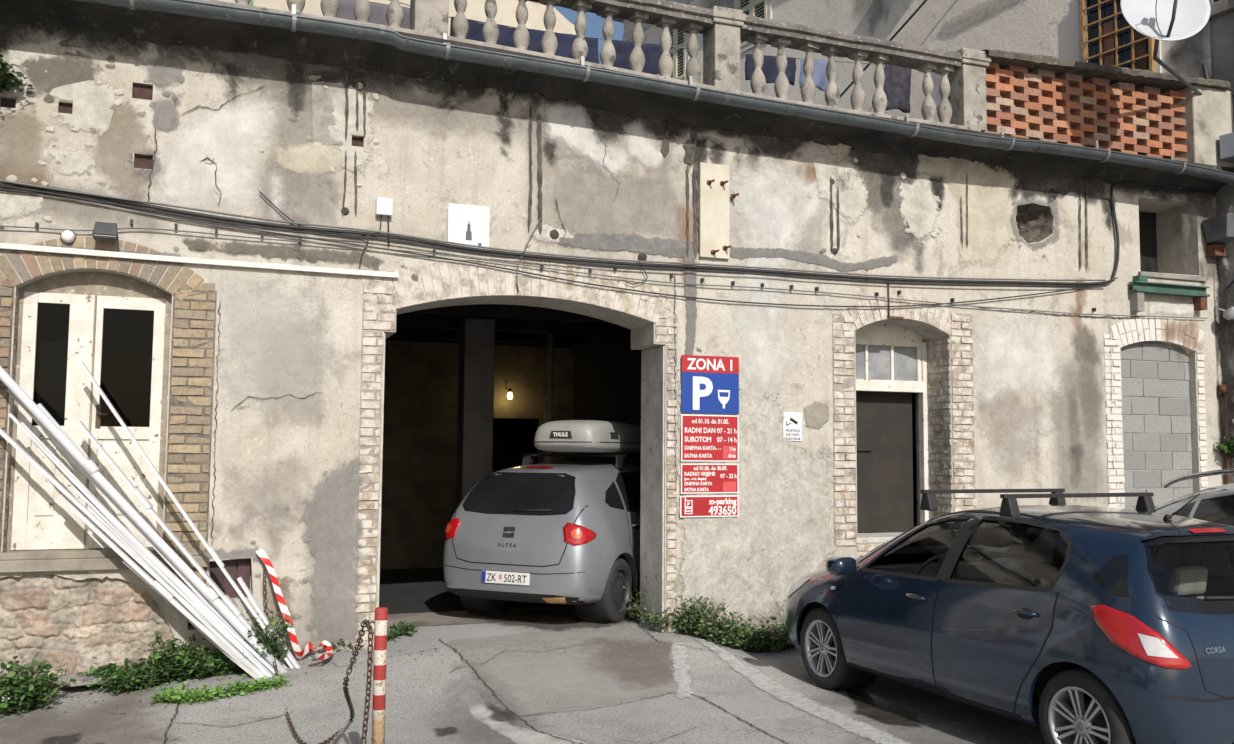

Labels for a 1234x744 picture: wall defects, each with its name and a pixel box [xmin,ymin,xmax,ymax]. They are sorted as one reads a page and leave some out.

peeling [0,40,185,228]
leakage [0,22,824,396]
leakage [847,147,944,270]
peeling [897,154,1060,265]
crack [210,302,322,542]
crack [163,684,293,744]